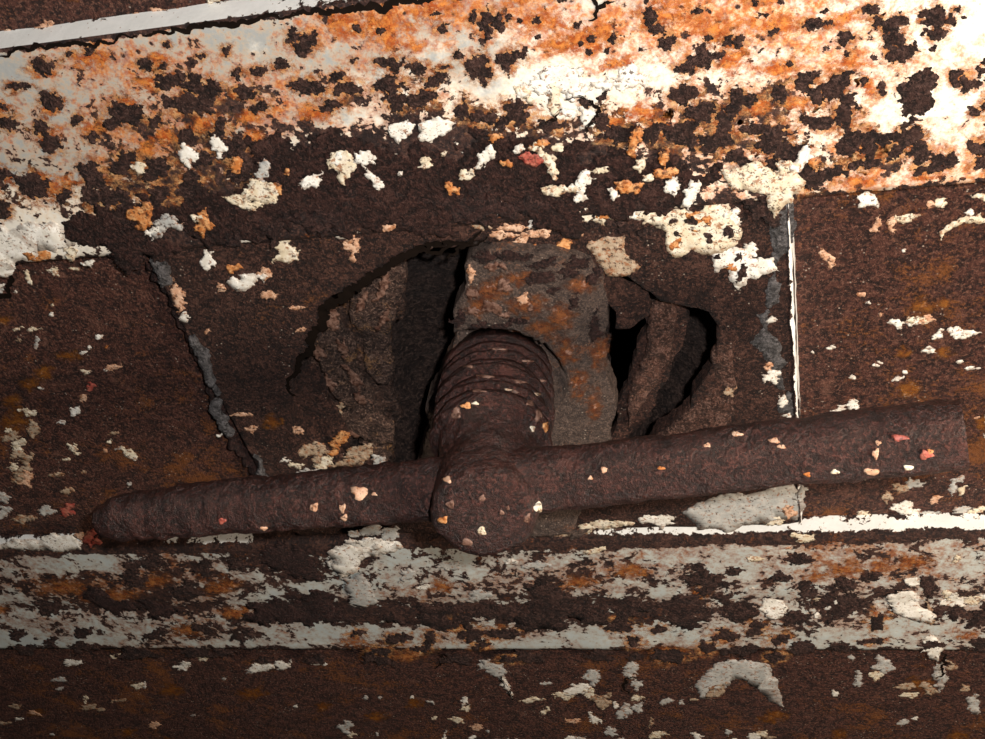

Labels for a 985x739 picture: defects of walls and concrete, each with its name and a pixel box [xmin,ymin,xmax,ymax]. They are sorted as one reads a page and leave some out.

rust [0,0,634,226]
rust [577,0,985,197]
spalling [0,63,822,300]
rust [657,215,735,244]
peeling [857,191,948,233]
crack [285,231,488,397]
peeling [879,312,982,354]
rust [339,618,528,664]
spalling [81,484,883,674]
rust [602,616,794,667]
peeling [659,643,784,707]
peeling [886,574,985,699]